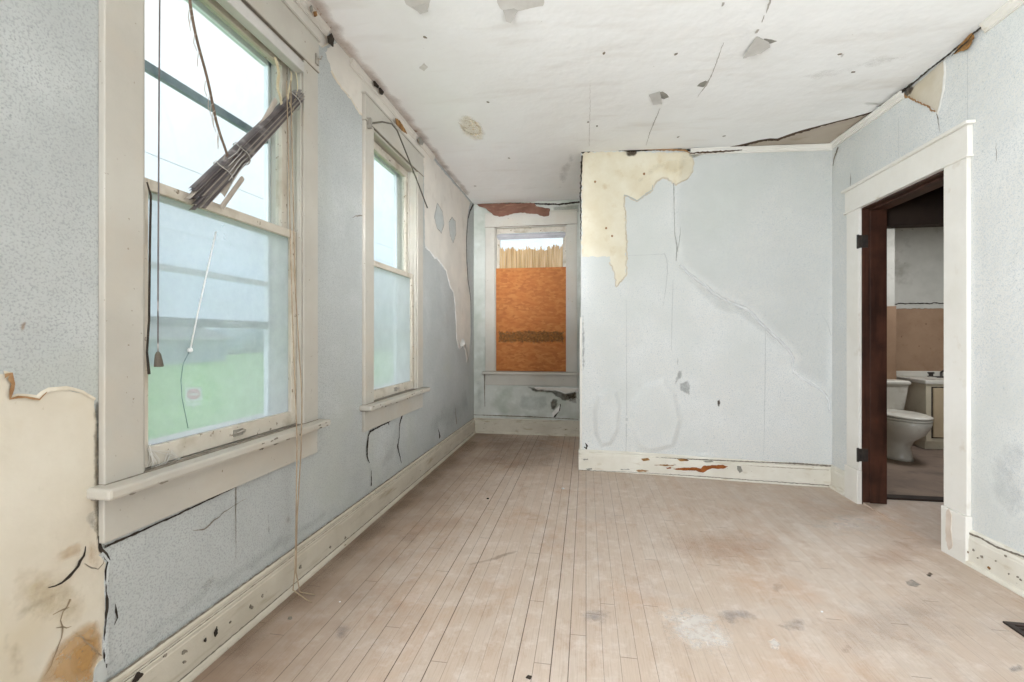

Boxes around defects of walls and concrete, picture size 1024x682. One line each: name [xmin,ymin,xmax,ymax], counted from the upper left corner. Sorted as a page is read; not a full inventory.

peeling [497,0,544,23]
peeling [743,36,776,58]
crack [45,414,578,682]
peeling [93,659,107,682]